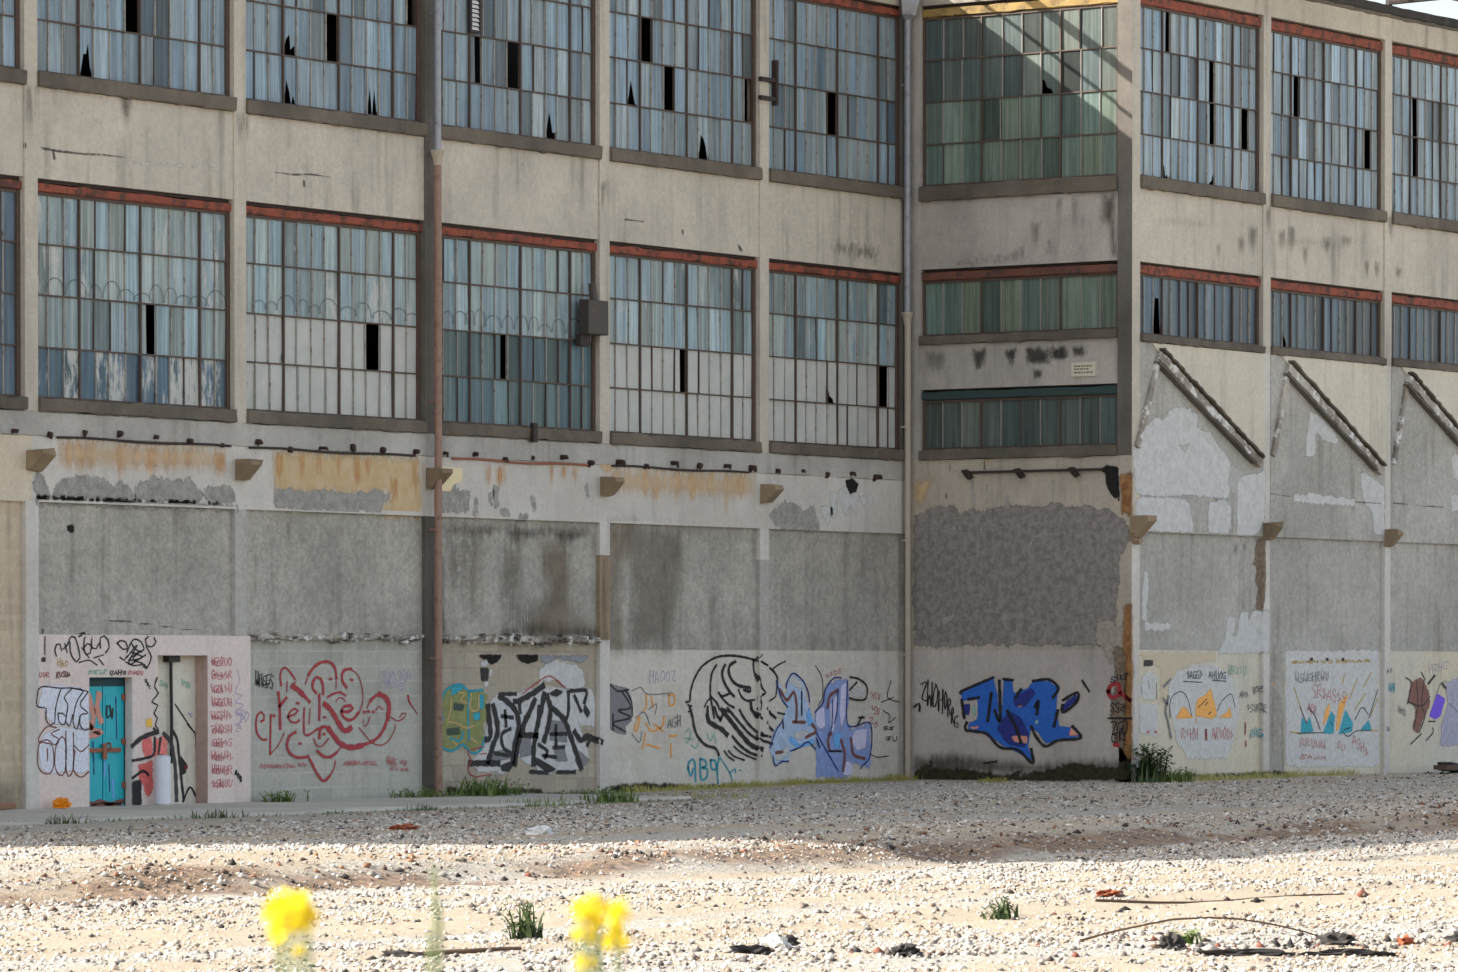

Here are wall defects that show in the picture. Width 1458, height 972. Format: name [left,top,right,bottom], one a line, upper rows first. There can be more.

rust [274,451,421,518]
peeling [912,406,1269,749]